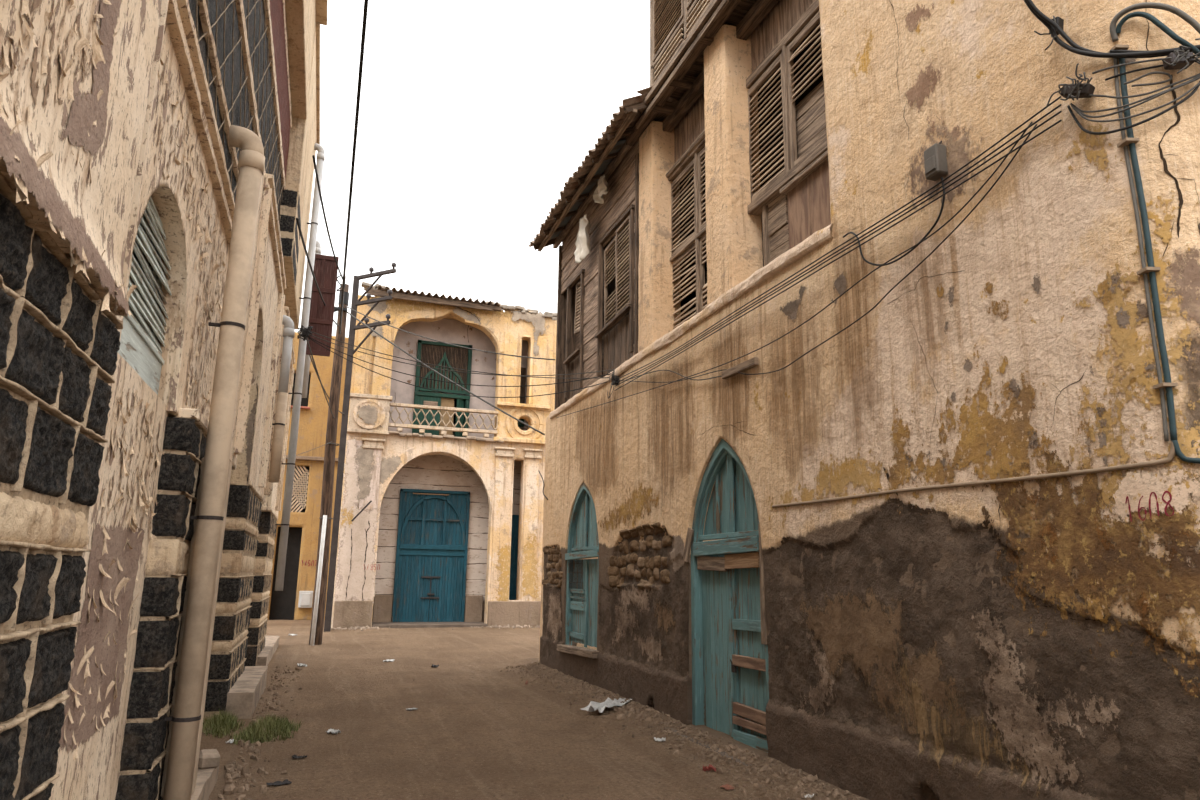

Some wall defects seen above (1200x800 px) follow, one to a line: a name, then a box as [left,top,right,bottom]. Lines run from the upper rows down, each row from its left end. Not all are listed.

peeling [0,0,137,317]
crack [1158,74,1200,260]
peeling [59,381,164,760]
flaking render [598,482,690,680]
leakage [653,369,689,489]
leakage [713,342,748,436]
leakage [772,321,814,460]
flaking render [763,190,1200,800]